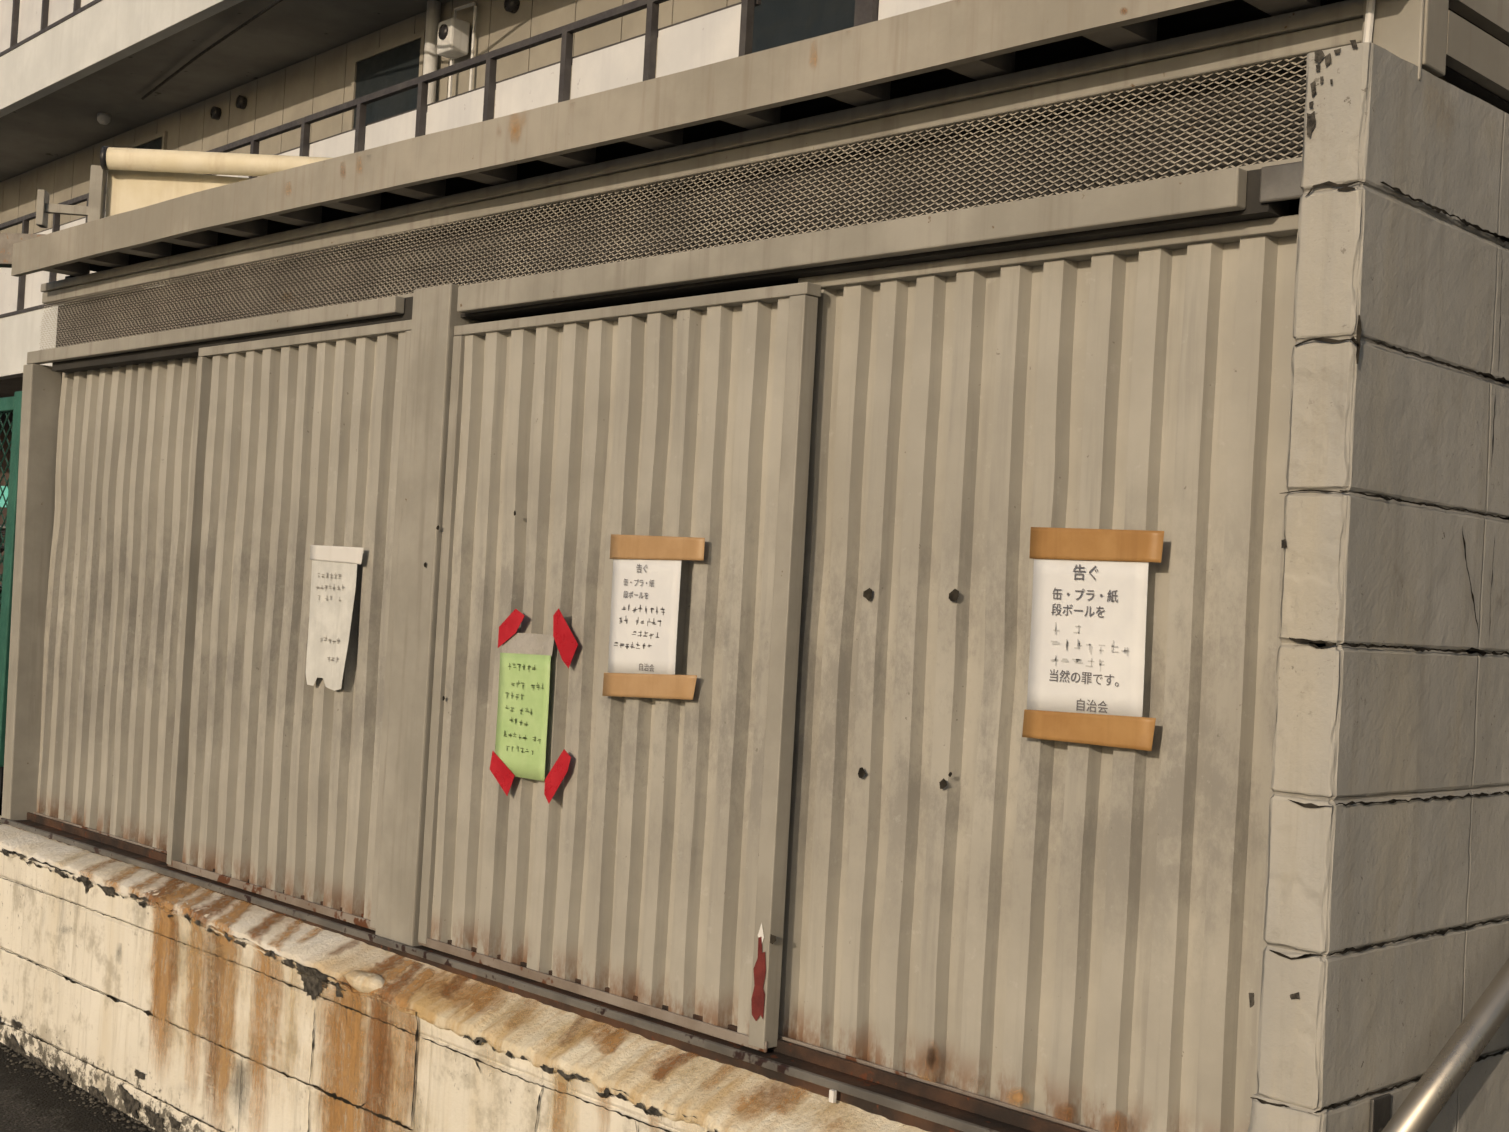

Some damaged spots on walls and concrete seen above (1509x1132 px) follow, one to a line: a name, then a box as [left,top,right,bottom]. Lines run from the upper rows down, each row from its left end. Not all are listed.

peeling [1306,40,1358,137]
crack [1295,181,1509,467]
corrosion [86,860,320,1106]
corrosion [324,955,494,1132]
corrosion [653,1052,699,1080]